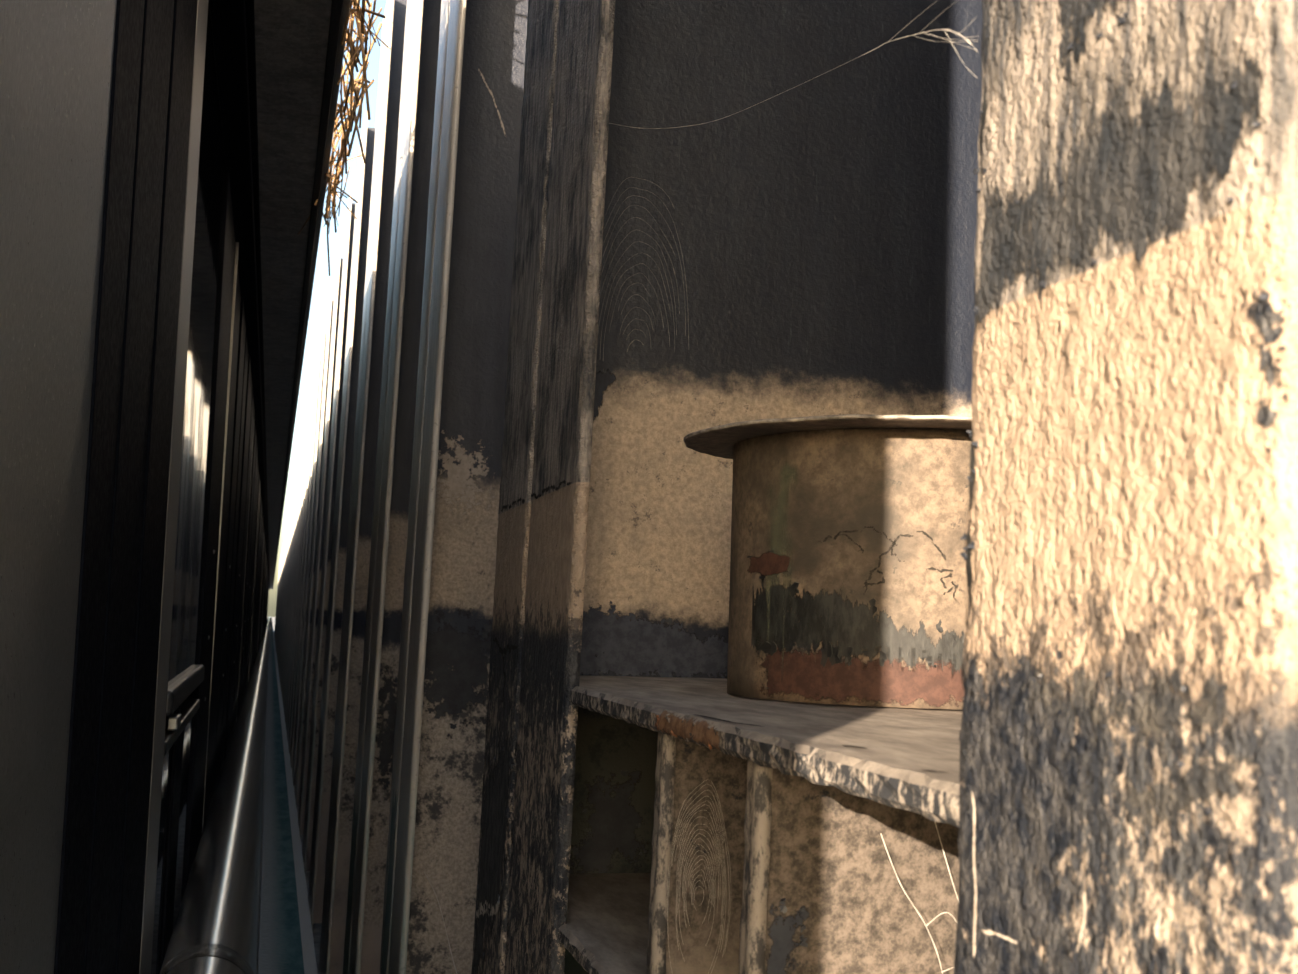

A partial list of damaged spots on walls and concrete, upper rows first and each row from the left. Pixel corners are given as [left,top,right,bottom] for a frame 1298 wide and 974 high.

peeling [436,430,495,522]
crack [817,526,959,603]
damp [580,600,728,679]
peeling [423,608,517,974]